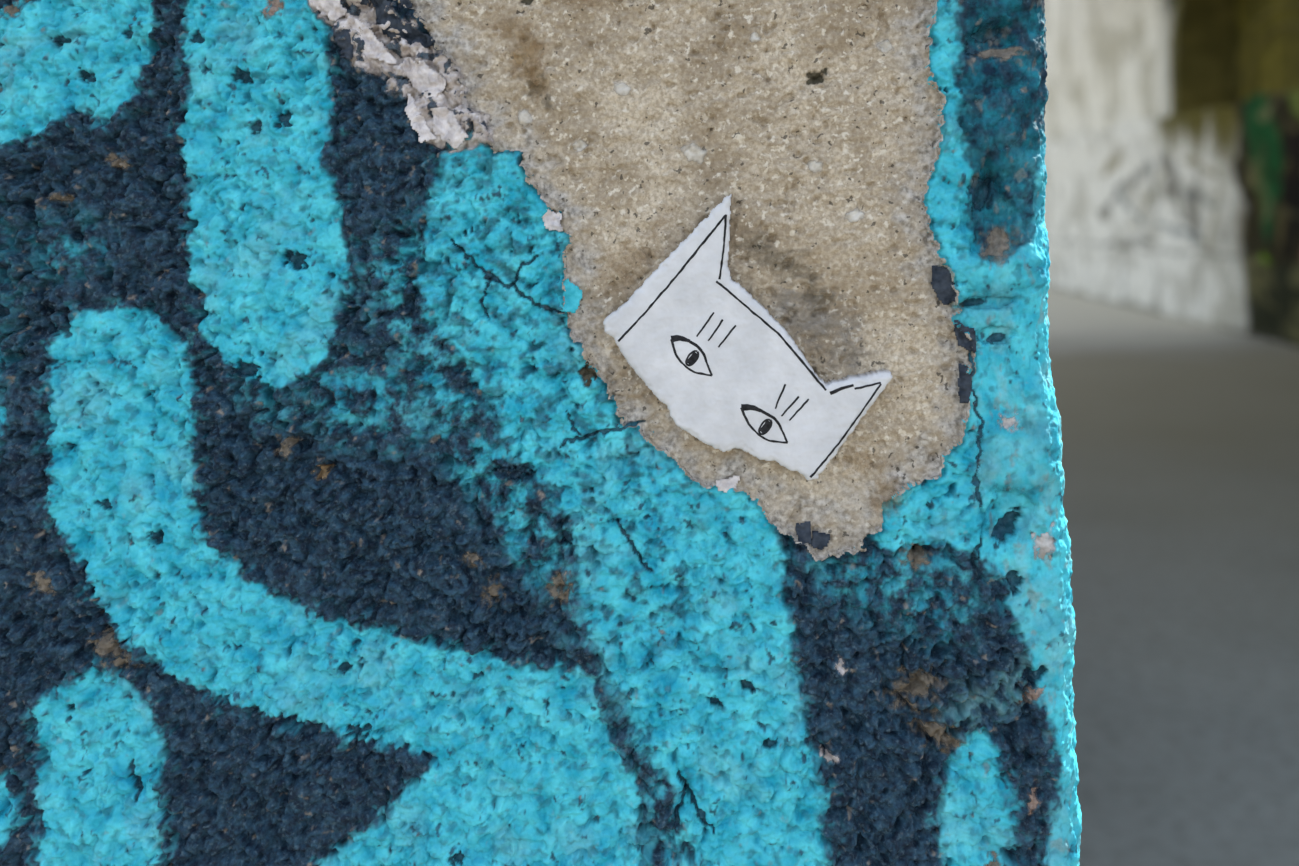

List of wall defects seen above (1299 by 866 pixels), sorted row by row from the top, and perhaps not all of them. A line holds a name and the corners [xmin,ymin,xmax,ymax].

peeling [262,0,284,17]
spalling [251,110,292,134]
spalling [285,250,309,270]
crack [451,239,565,317]
spalling [308,0,977,561]
peeling [275,435,299,456]
crack [968,351,984,568]
peeling [901,544,930,569]